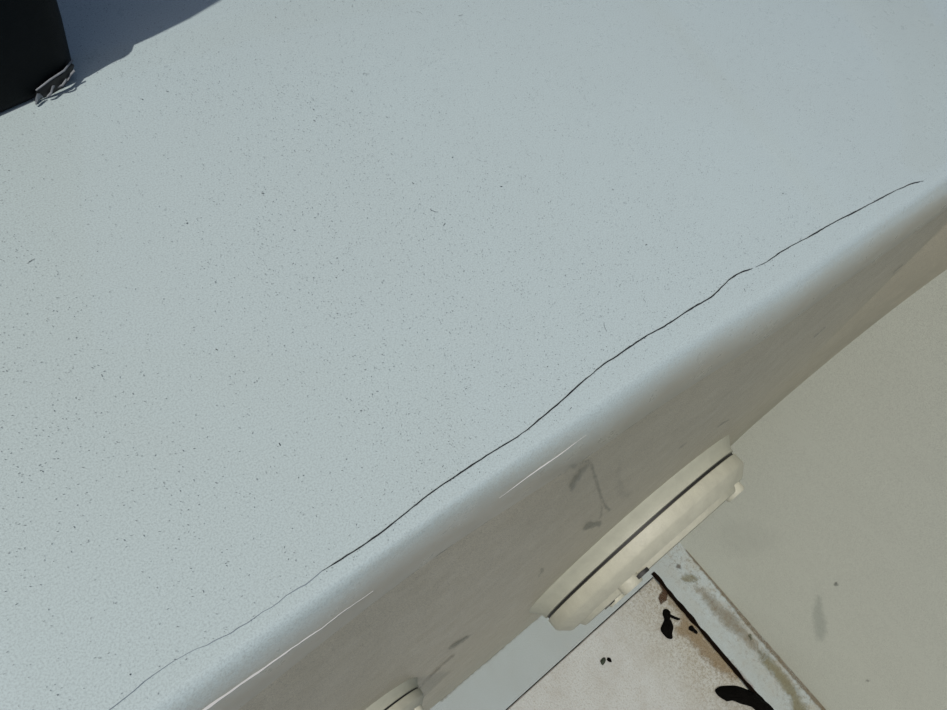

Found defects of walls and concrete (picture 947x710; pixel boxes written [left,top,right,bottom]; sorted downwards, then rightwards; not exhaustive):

crack [109,181,921,710]